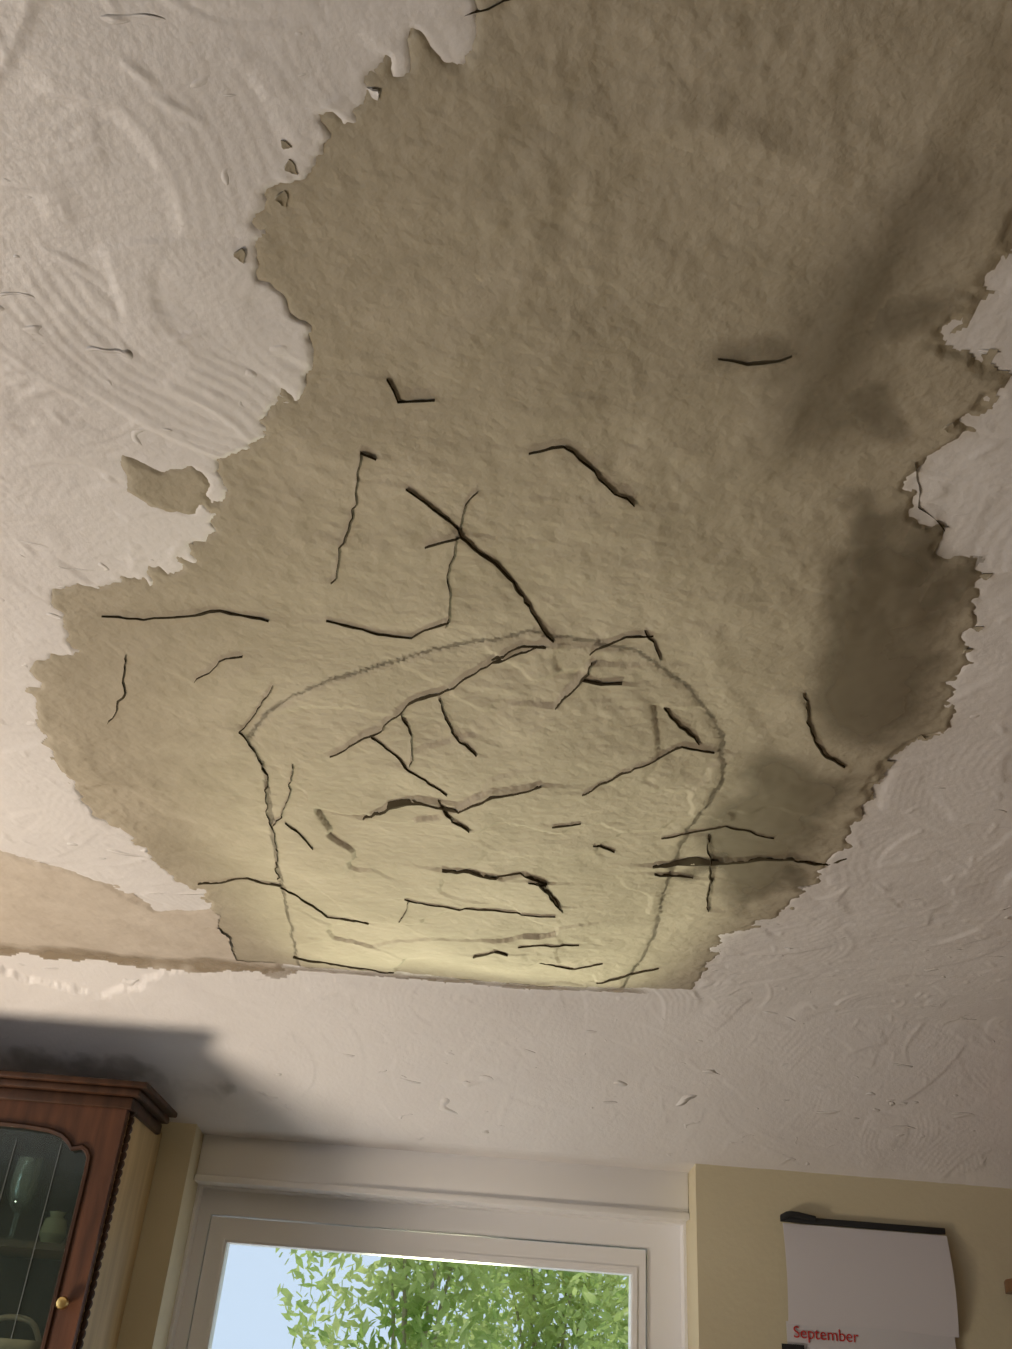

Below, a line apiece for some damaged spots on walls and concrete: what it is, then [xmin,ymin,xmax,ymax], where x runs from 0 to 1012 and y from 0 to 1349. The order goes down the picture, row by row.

crack [386,379,435,404]
spalling [0,0,1012,990]
crack [529,445,635,507]
crack [102,610,269,622]
crack [198,685,659,984]
crack [326,489,554,833]
crack [555,630,660,710]
crack [552,707,715,853]
crack [653,826,847,912]
water stain [703,759,840,902]
crack [803,695,845,769]
water stain [820,525,947,742]